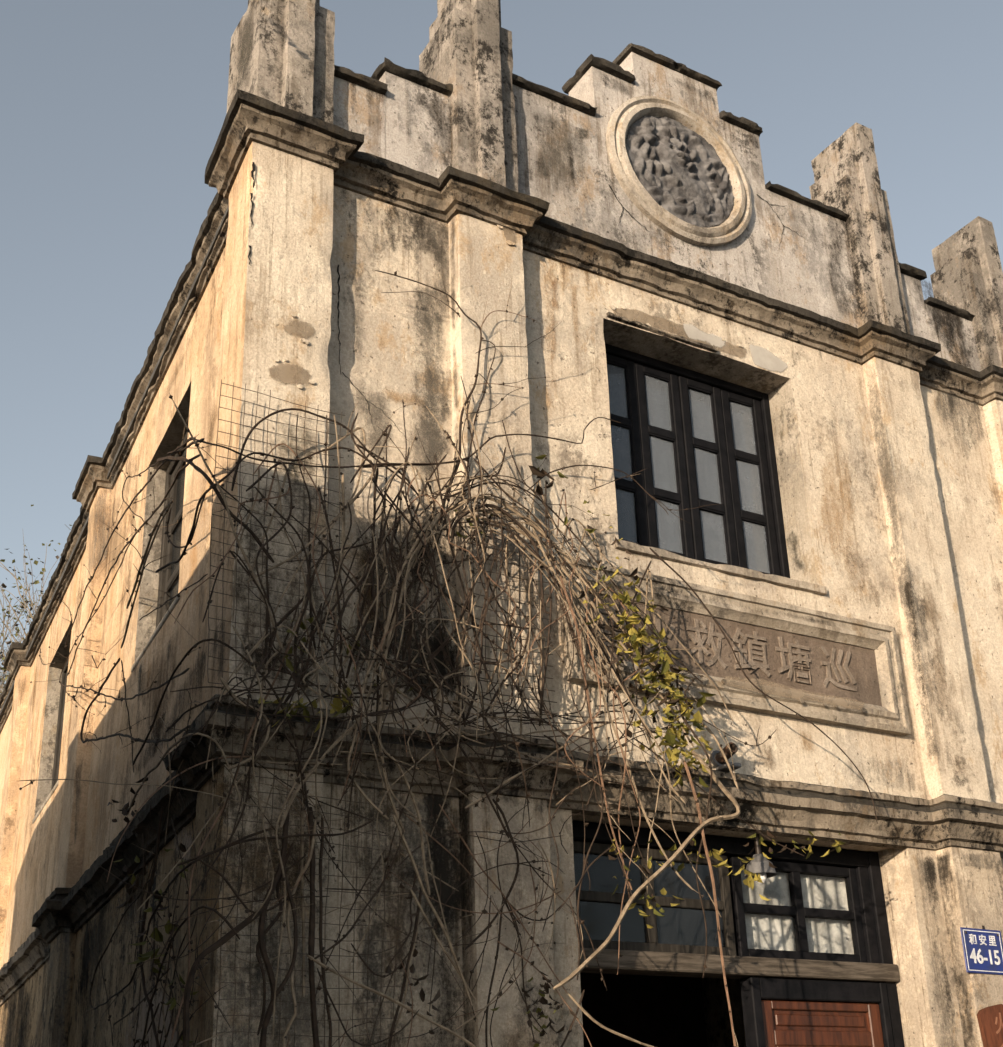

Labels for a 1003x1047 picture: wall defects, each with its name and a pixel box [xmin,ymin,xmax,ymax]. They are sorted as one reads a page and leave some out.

water stain [237,20,252,86]
crack [247,162,255,265]
water stain [829,191,863,314]
crack [337,265,402,433]
flaking render [609,305,746,358]
water stain [873,407,934,650]
water stain [0,987,30,1047]